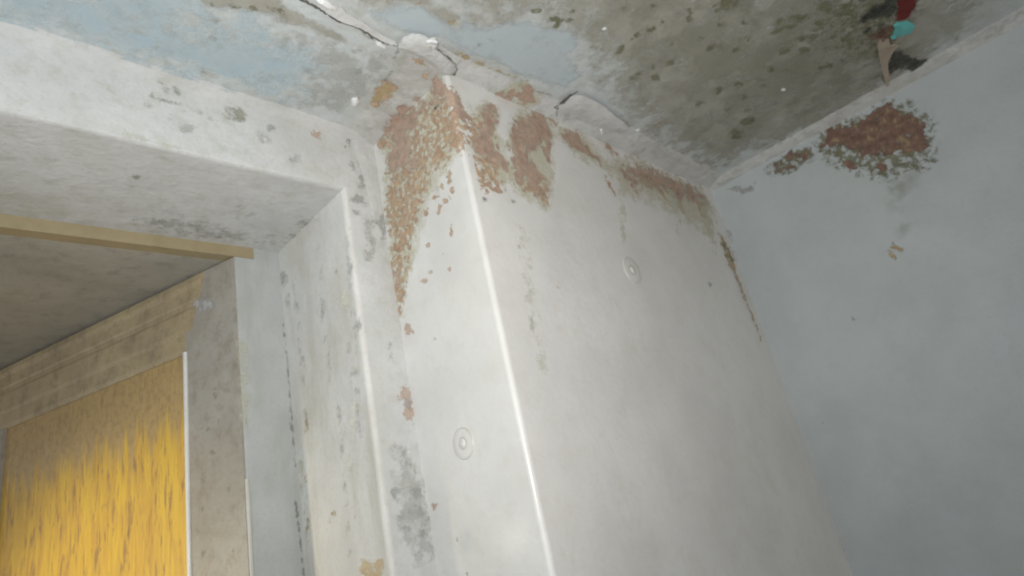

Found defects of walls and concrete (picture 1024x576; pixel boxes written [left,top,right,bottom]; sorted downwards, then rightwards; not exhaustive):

crack [299,0,399,80]
crack [536,91,577,116]
damp [500,0,974,163]